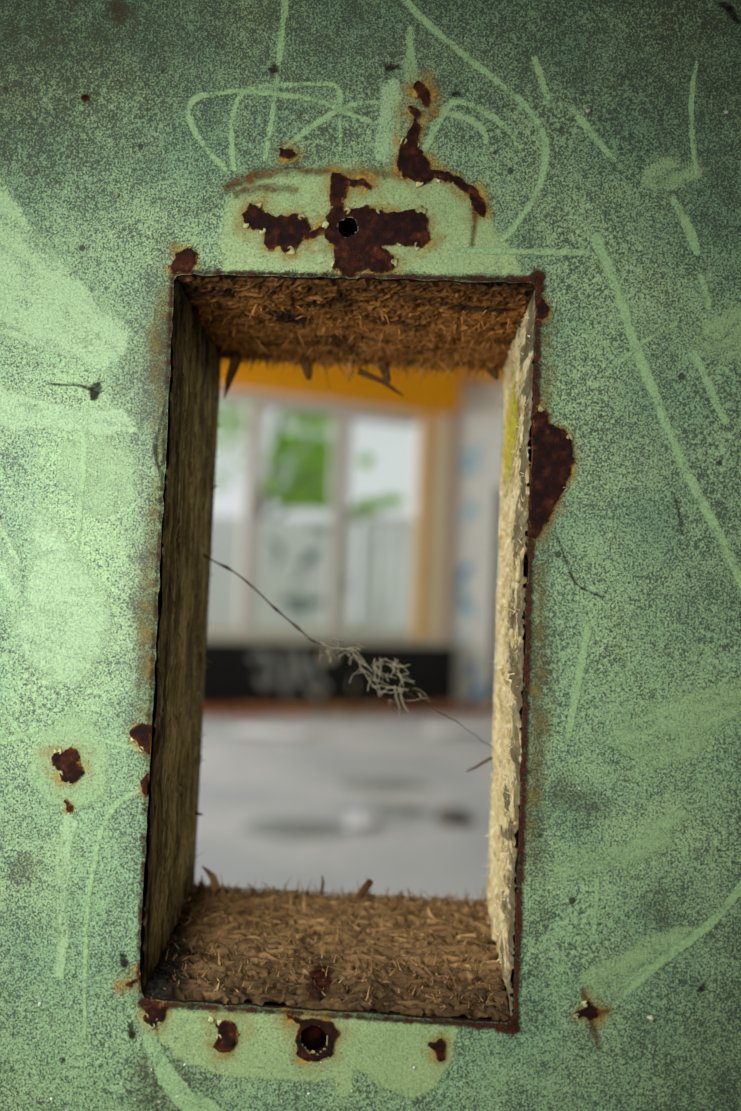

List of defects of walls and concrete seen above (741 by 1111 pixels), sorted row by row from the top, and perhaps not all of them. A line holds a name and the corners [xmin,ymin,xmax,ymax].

rust [115,73,576,1064]
rust [51,747,84,785]
rust [573,996,607,1045]